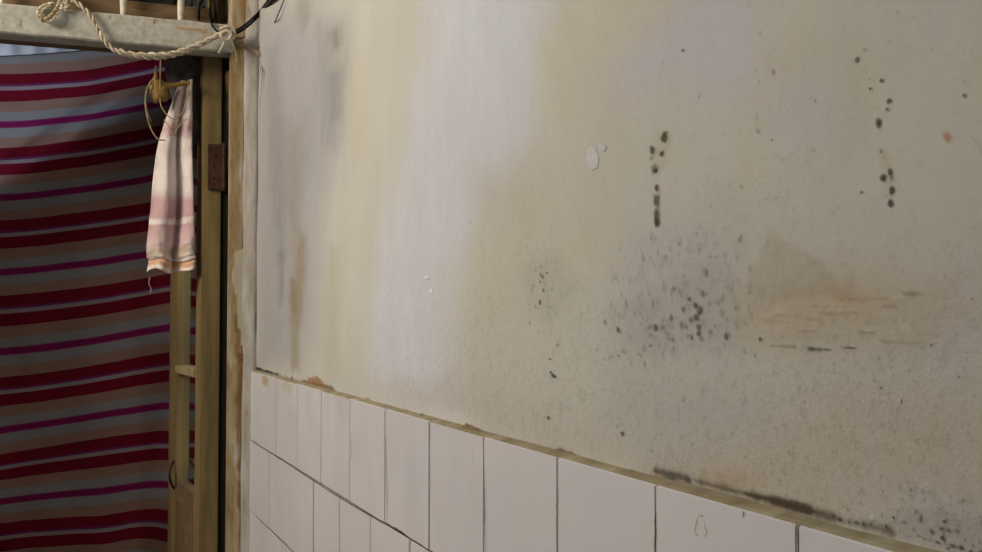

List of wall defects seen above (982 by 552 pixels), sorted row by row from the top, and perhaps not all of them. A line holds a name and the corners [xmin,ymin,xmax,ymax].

leakage [650,131,667,227]
leakage [648,291,711,347]
leakage [743,492,813,552]
leakage [837,499,982,552]